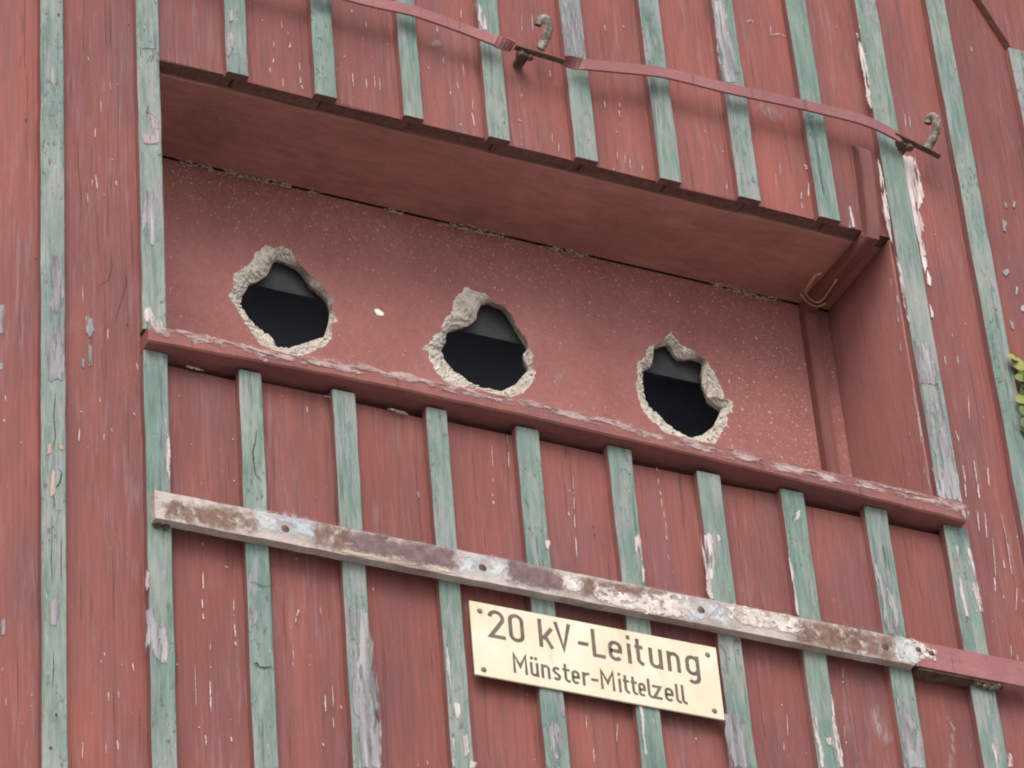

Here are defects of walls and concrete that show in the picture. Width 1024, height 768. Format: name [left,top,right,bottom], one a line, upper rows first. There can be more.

peeling [856,33,873,109]
peeling [877,160,892,242]
peeling [144,245,969,519]
corrosion [165,500,257,530]
corrosion [314,522,459,569]
corrosion [508,559,565,589]
corrosion [581,578,667,595]
peeling [701,533,720,600]
peeling [146,608,173,663]
corrosion [798,621,894,658]
peeling [347,595,382,768]